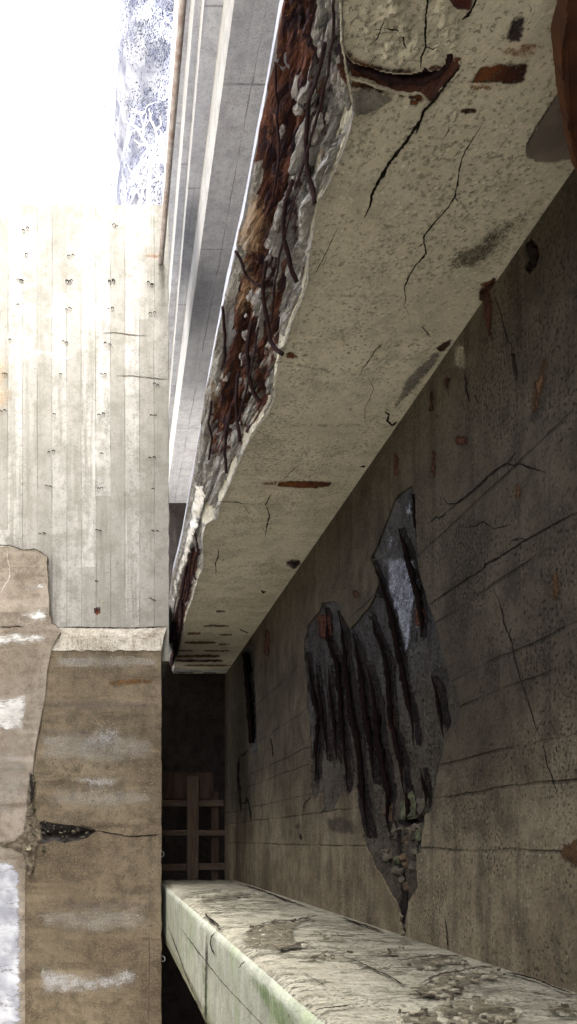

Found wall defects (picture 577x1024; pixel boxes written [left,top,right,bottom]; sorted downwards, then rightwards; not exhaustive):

crack [368,0,438,69]
crack [462,0,477,20]
rust [471,17,536,90]
crack [364,65,461,218]
crack [404,114,484,337]
spalling [168,0,461,672]
crack [430,452,577,789]
spalling [25,820,96,852]
crack [81,825,157,837]
crack [237,739,273,822]
spalling [305,487,524,1024]
efflorescence [0,863,21,1024]